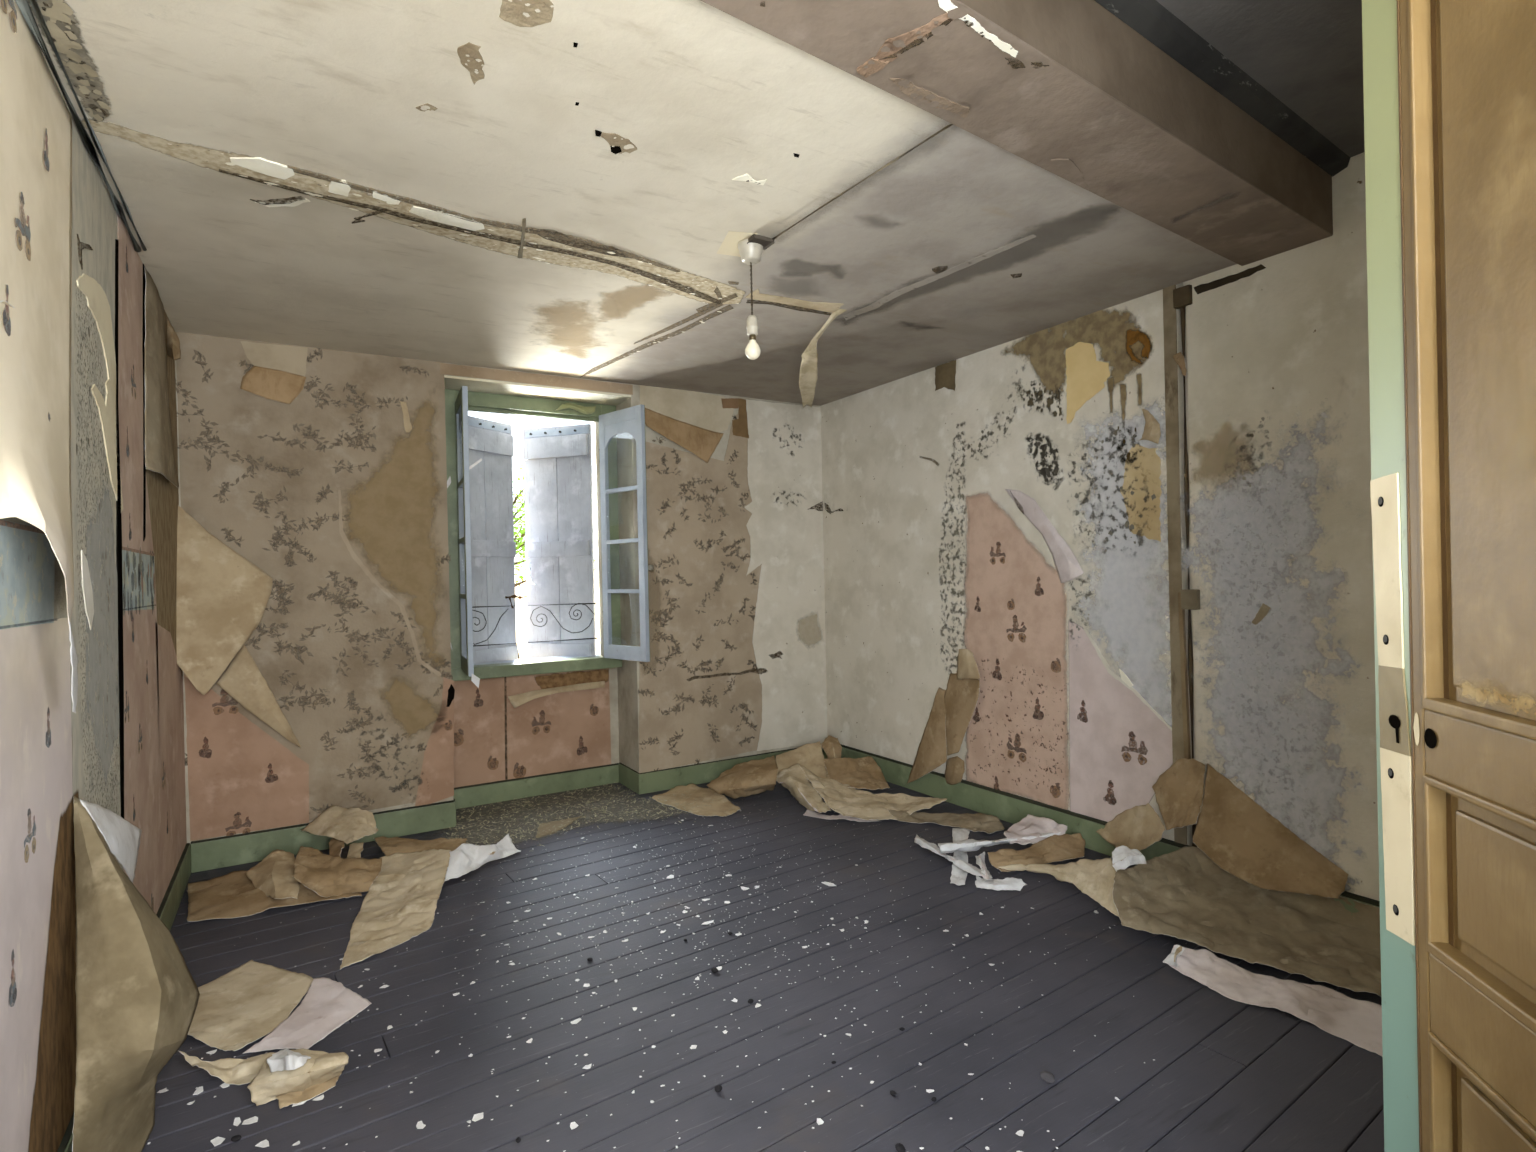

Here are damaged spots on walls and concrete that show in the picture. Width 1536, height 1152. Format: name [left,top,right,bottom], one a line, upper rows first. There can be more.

spalling [938,0,1049,69]
crack [219,165,739,377]
peeling [935,360,956,391]
peeling [1065,342,1110,424]
peeling [1120,409,1162,542]
peeling [28,0,844,1152]
peeling [1005,489,1083,583]
peeling [907,687,947,784]